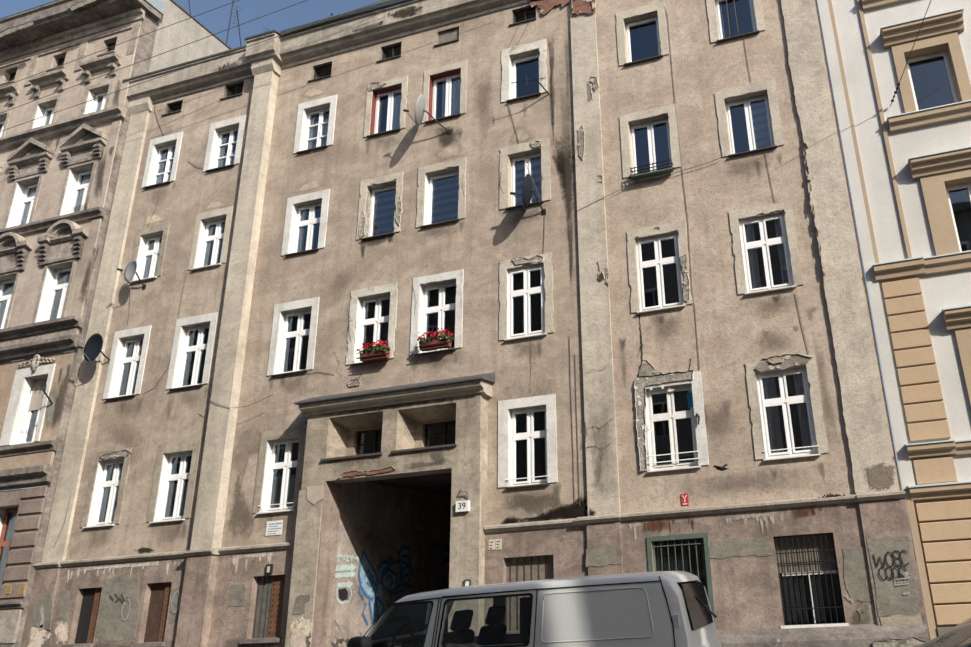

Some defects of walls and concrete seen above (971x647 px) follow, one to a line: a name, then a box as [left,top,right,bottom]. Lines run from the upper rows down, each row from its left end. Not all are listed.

flaking render [527,0,596,16]
flaking render [587,77,599,101]
water stain [440,128,457,146]
water stain [553,145,574,218]
crack [803,140,825,274]
crack [636,314,644,376]
flaking render [755,353,812,372]
flaking render [633,360,694,472]
water stain [503,495,595,524]
flaking render [27,621,69,647]